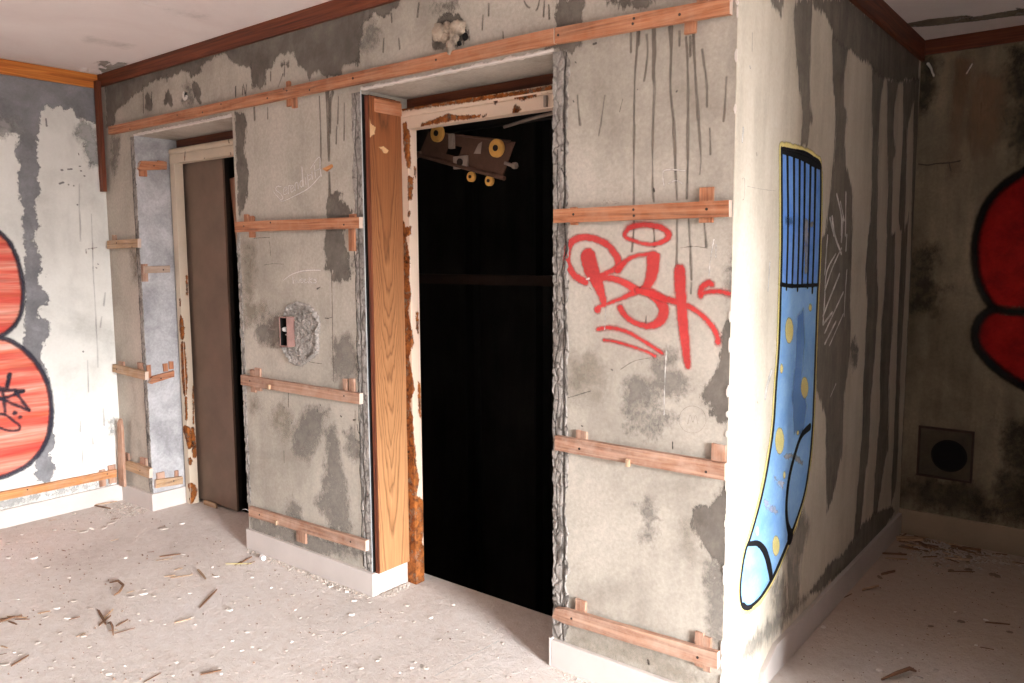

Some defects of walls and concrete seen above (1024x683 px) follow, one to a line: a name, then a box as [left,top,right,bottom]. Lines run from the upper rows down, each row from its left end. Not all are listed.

water stain [630,25,711,202]
peeling [0,74,98,382]
rust [179,275,197,465]
rust [188,483,198,504]
spalling [281,301,321,367]
water stain [251,404,363,557]
spalling [351,48,571,572]
rust [402,85,553,585]
spalling [552,222,570,642]
water stain [625,350,687,432]
water stain [676,218,692,294]
water stain [743,0,1024,658]